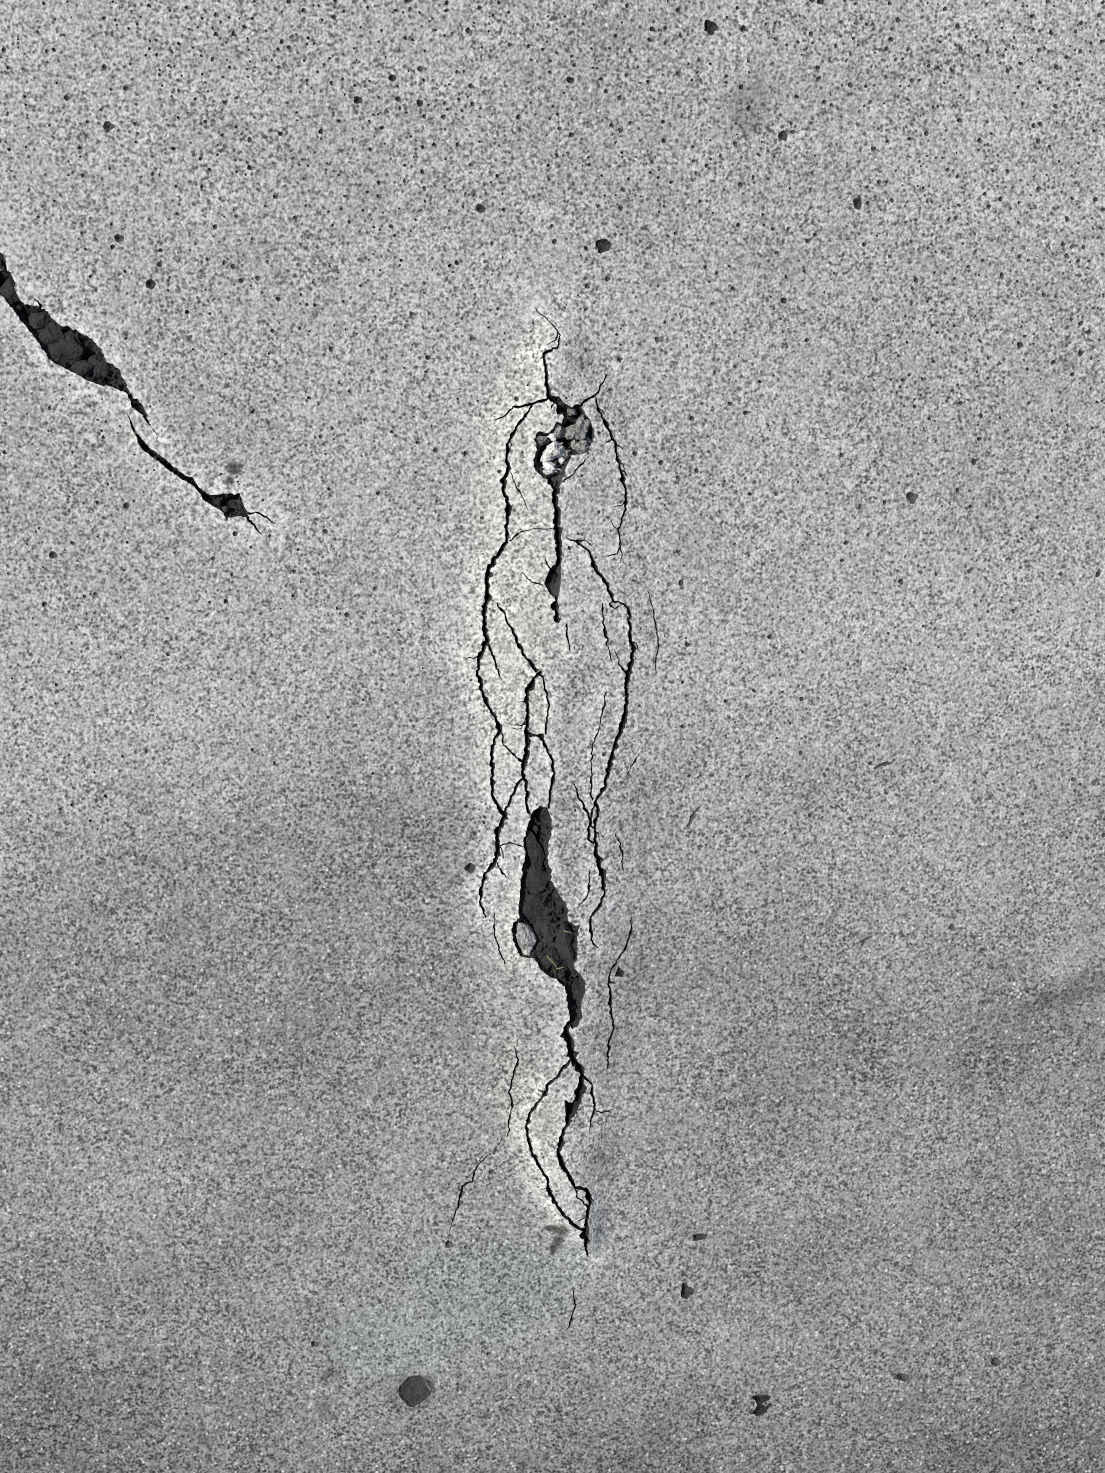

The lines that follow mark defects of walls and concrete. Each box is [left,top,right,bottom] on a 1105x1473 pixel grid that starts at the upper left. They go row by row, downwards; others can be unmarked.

crack [127,413,275,535]
spalling [511,806,586,1029]
crack [448,308,660,1330]